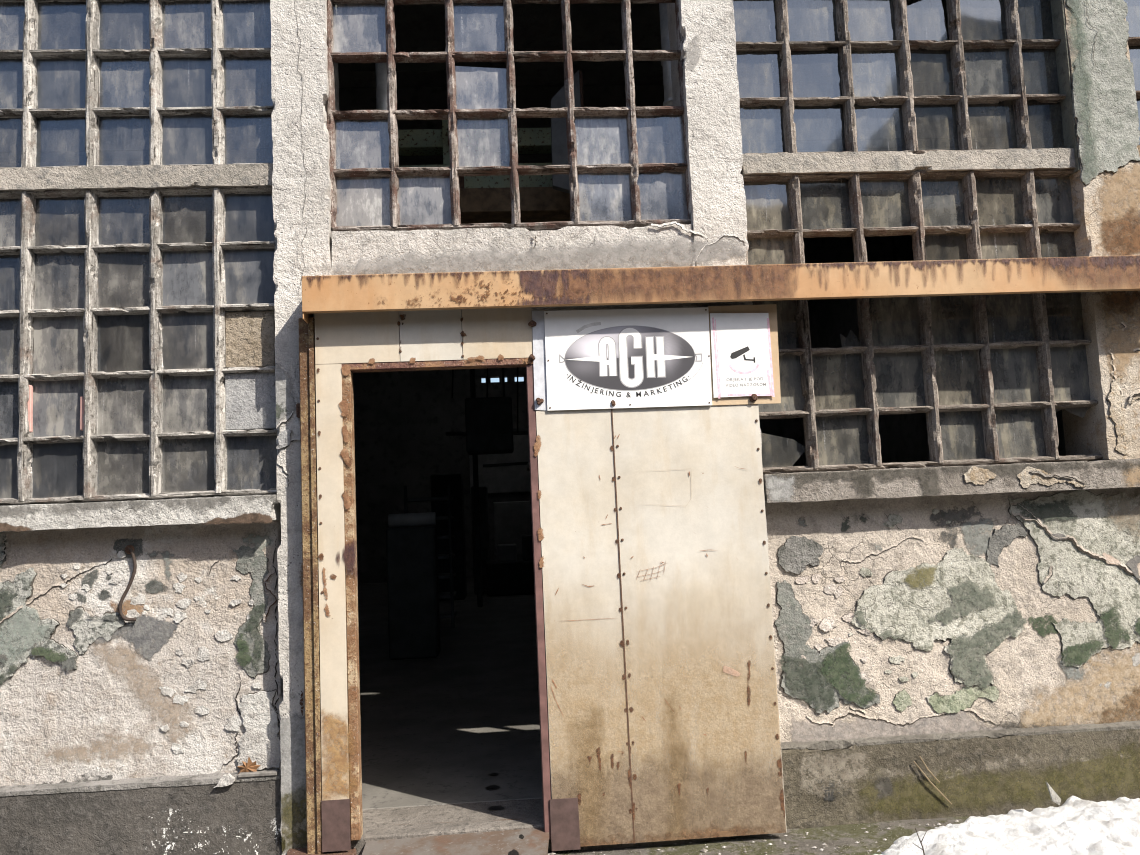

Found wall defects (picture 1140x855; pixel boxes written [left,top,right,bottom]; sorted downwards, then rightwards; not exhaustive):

corrosion [302,163,1140,381]
corrosion [338,400,352,467]
corrosion [342,491,351,509]
crack [0,554,113,624]
peeling [0,513,273,698]
crack [263,524,305,738]
corrosion [318,539,357,616]
peeling [774,466,1140,742]
crack [1011,503,1140,583]
spalling [159,679,210,754]
crack [218,673,243,772]
spalling [224,714,243,731]